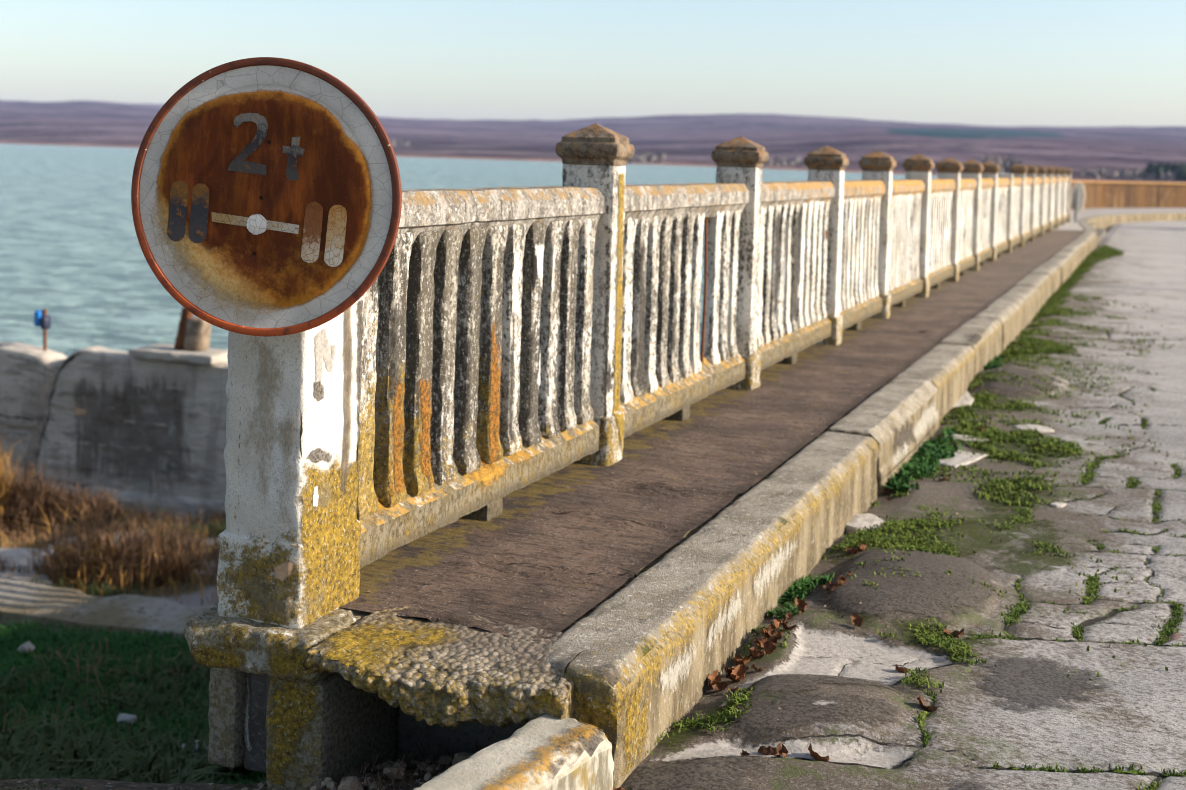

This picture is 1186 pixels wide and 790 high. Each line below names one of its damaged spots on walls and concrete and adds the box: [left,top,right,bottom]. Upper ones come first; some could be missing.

rust [156,90,372,310]
water stain [773,210,801,321]
crack [0,352,82,476]
rust [387,381,406,499]
rust [419,378,434,487]
mould [454,267,474,428]
rust [478,318,502,472]
crack [968,384,1186,647]
spalling [657,738,913,769]
spalling [720,623,952,707]
crack [726,656,1186,790]
water stain [971,655,1107,711]